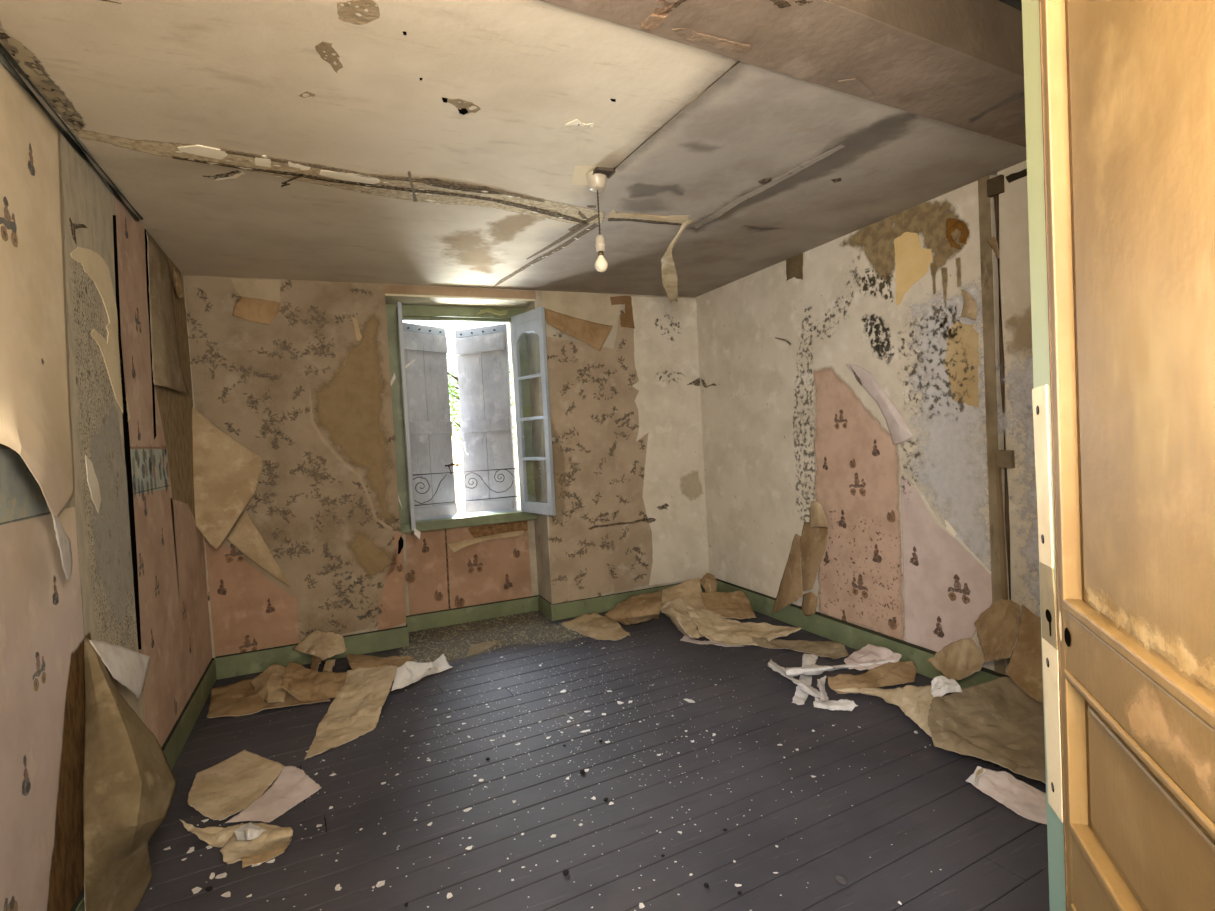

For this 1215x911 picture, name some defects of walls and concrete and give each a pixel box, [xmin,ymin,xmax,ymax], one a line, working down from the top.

spalling [337,0,380,25]
spalling [770,0,813,8]
crack [172,148,598,287]
peeling [786,253,803,280]
peeling [894,232,933,305]
peeling [943,289,980,408]
peeling [0,29,690,911]
peeling [631,296,709,585]
peeling [846,364,912,445]
peeling [772,534,803,614]